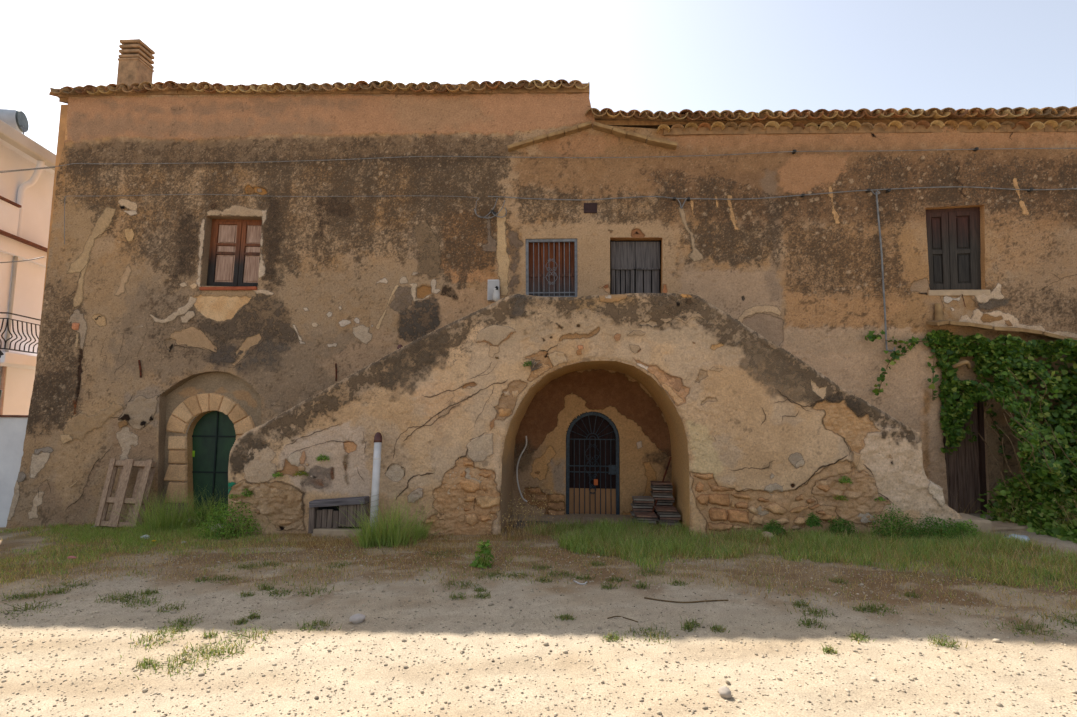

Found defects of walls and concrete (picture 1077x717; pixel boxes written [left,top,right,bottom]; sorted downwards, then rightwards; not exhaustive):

leakage [715,195,739,230]
leakage [828,186,840,224]
leakage [1013,178,1029,215]
peeling [141,185,274,352]
peeling [312,272,440,330]
peeling [910,278,1077,338]
peeling [438,382,476,418]
flaking render [690,379,891,535]
flaking render [229,446,309,531]
flaking render [423,457,501,535]
peeling [928,480,945,507]